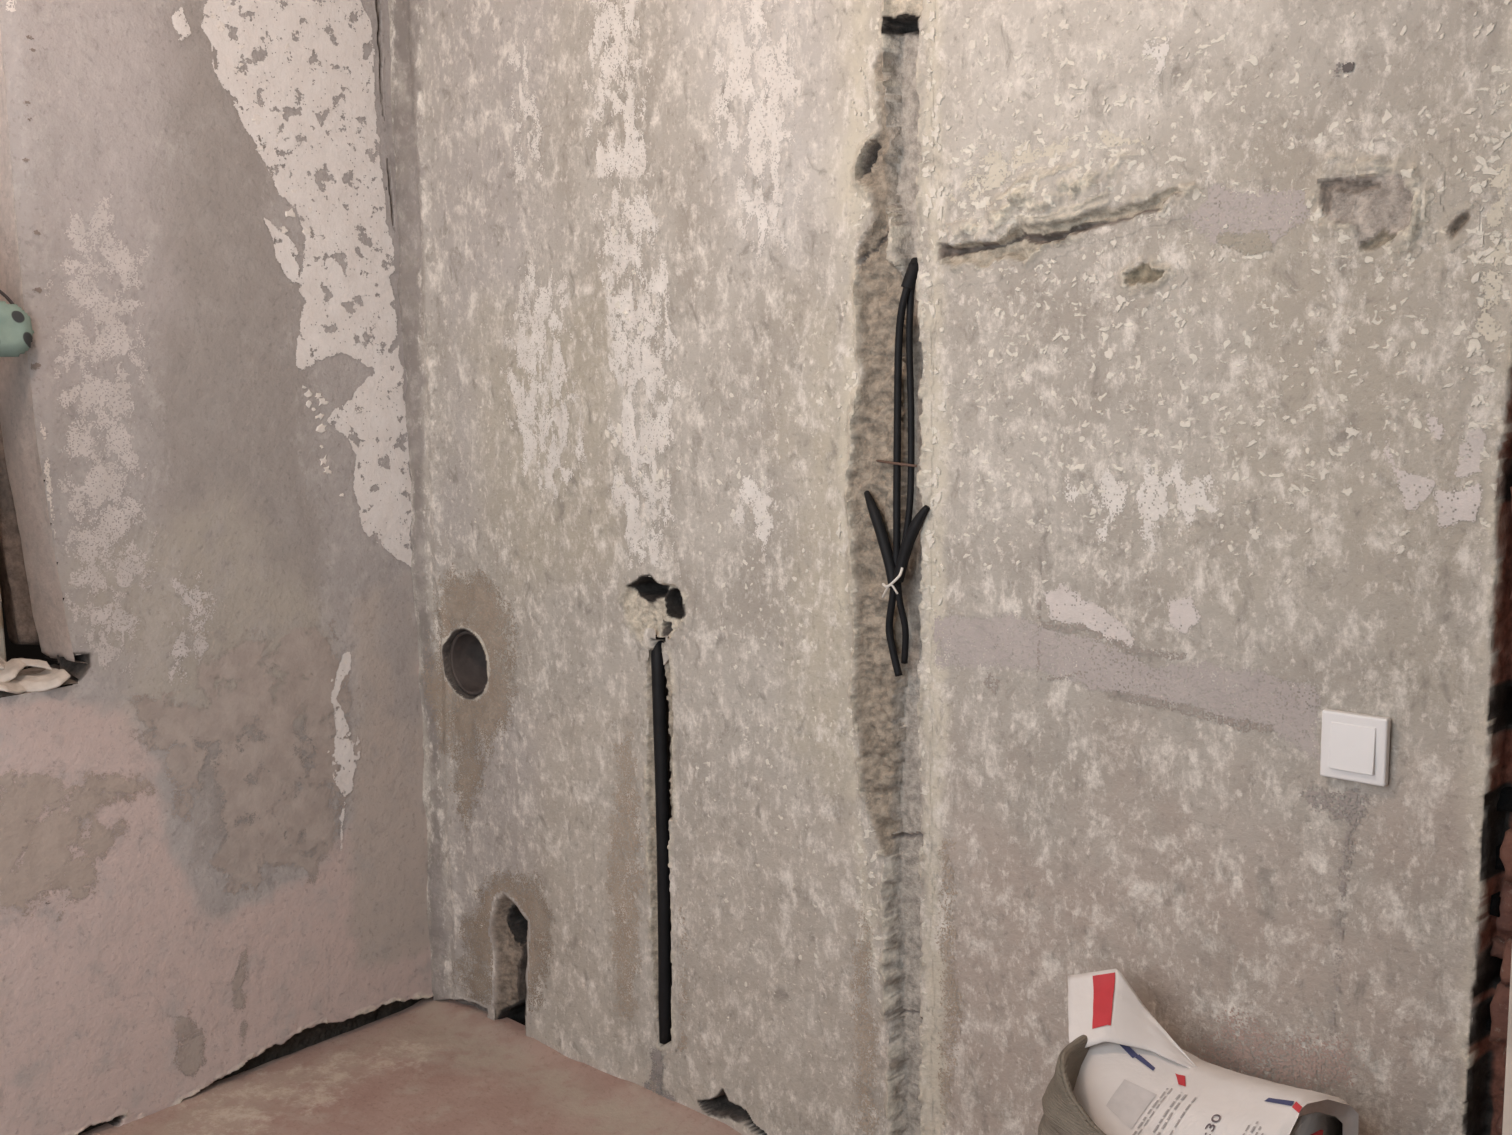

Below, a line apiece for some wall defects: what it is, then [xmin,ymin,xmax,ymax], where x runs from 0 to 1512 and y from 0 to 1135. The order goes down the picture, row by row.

peeling [172,0,412,567]
peeling [705,457,791,586]
spalling [816,0,1219,886]
flaking render [1304,106,1512,1135]
crack [58,990,434,1135]